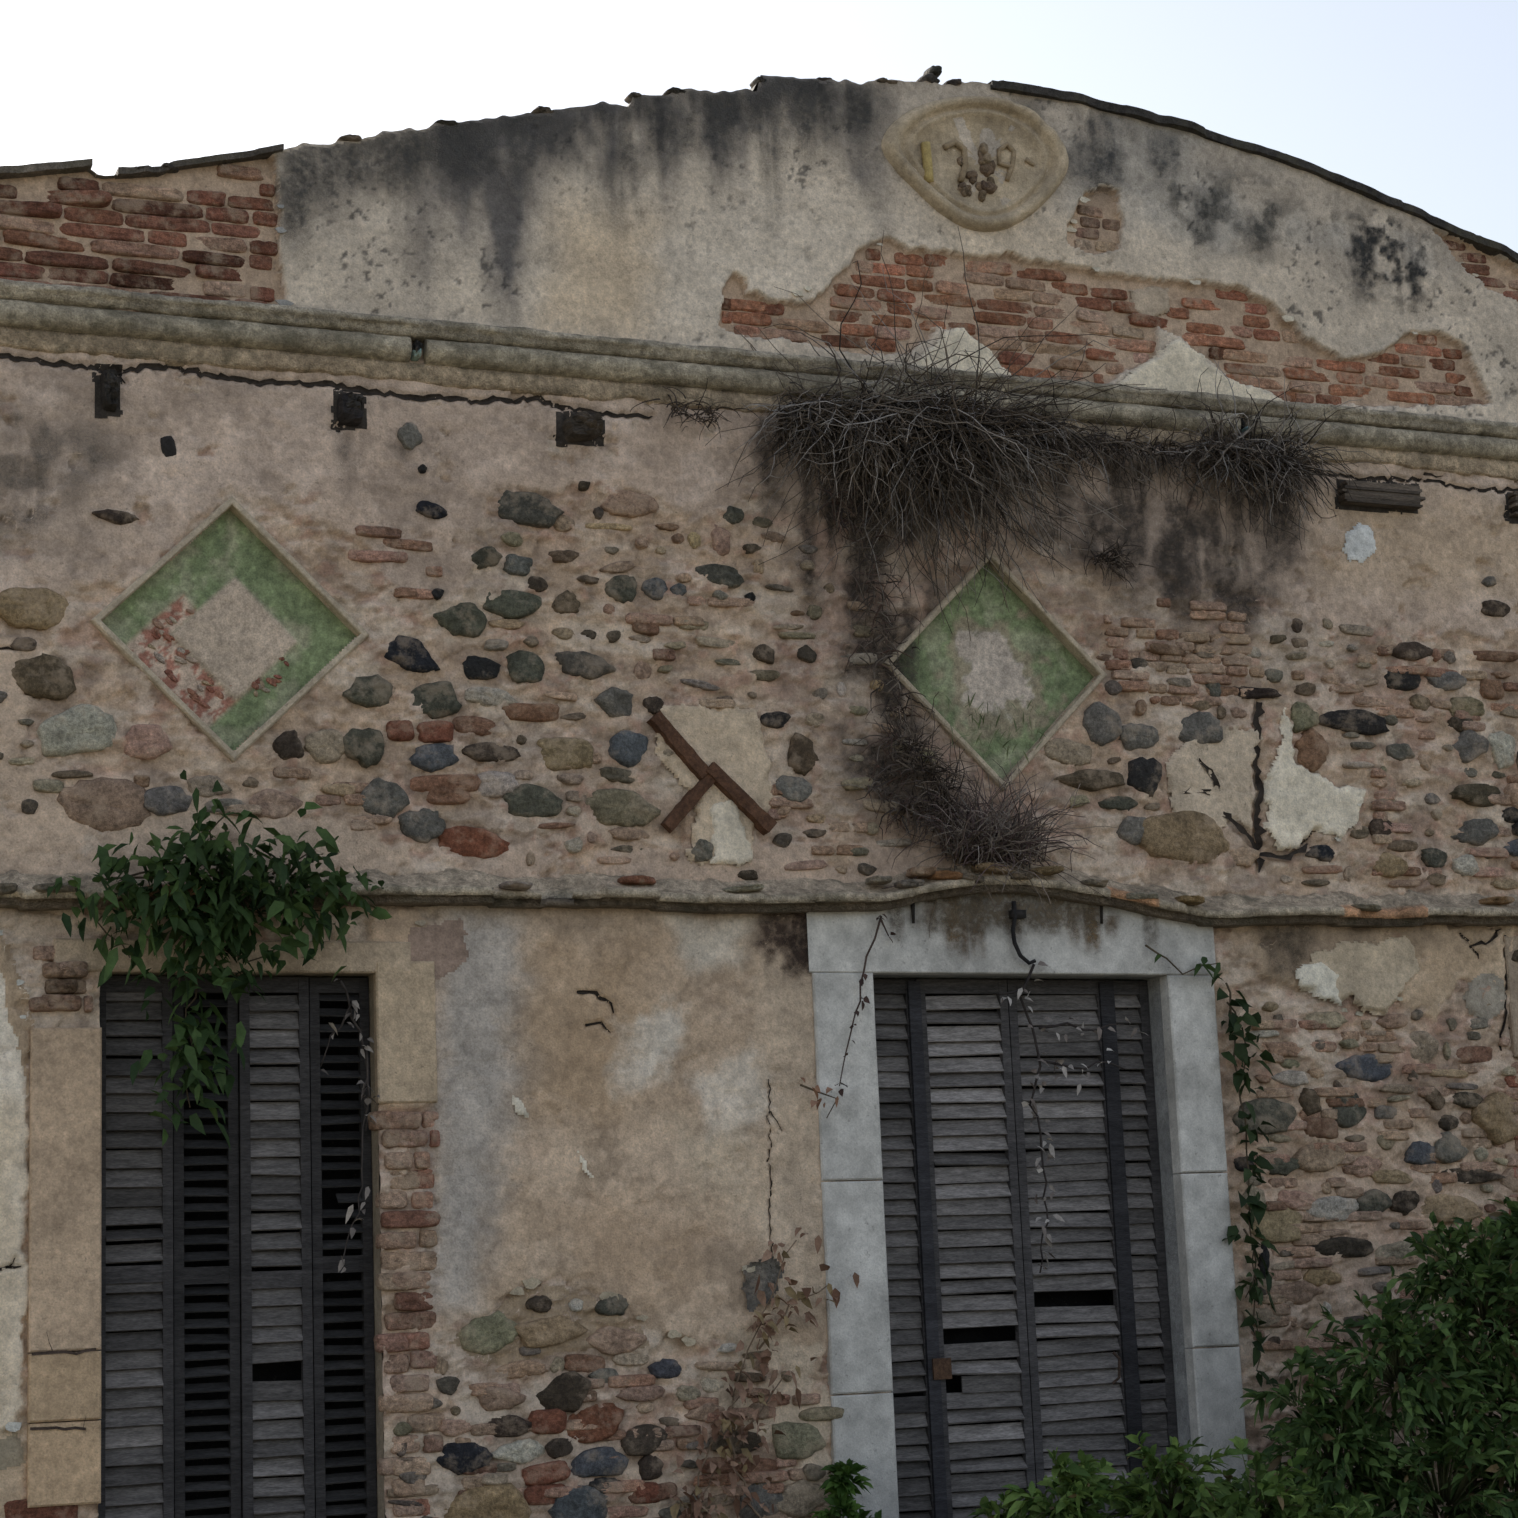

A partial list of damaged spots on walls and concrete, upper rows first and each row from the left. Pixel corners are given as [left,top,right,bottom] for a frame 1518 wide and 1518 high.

spalling [0,156,294,312]
water stain [287,118,572,218]
spalling [718,187,1489,408]
water stain [1353,218,1427,295]
crack [0,353,653,419]
water stain [800,437,949,732]
water stain [1036,463,1307,620]
crack [1183,701,1313,873]
crack [577,990,614,1032]
peeling [1295,935,1420,1016]